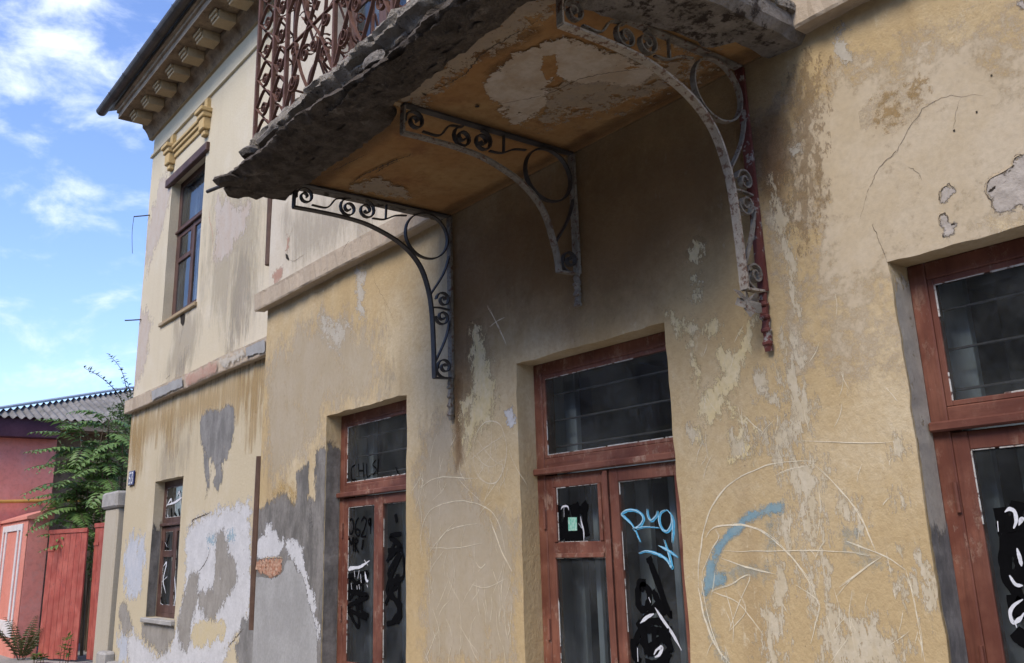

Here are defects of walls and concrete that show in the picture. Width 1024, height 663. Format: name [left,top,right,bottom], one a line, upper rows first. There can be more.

spalling [394,0,806,134]
crack [860,94,982,262]
spalling [938,183,957,238]
spalling [984,153,1024,215]
peeling [458,322,516,457]
peeling [664,172,940,663]
peeling [115,495,321,663]